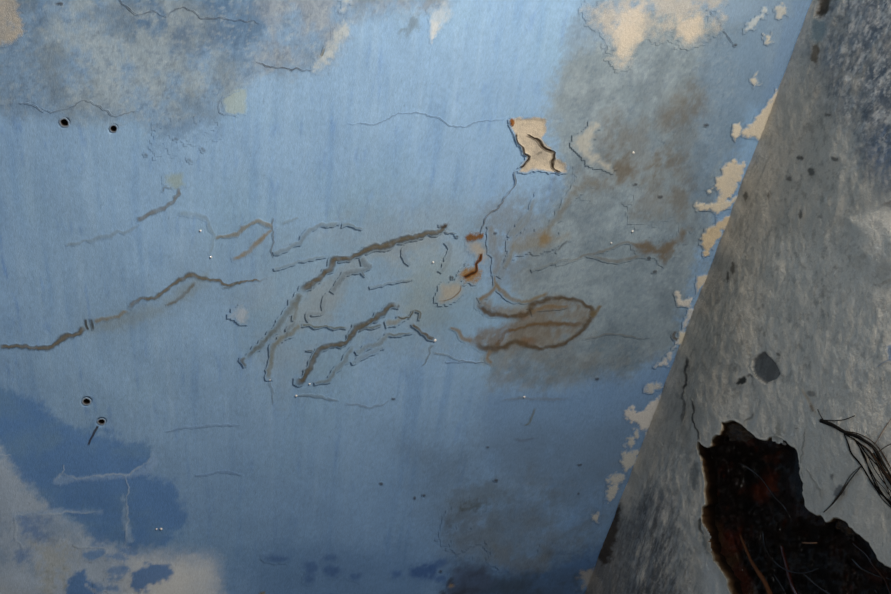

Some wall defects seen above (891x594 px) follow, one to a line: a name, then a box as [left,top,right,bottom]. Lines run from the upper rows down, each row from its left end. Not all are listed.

peeling [0,0,28,47]
peeling [578,0,731,73]
spalling [508,115,568,175]
peeling [570,120,618,174]
peeling [731,87,778,143]
peeling [693,158,749,258]
rust [434,229,490,306]
water stain [0,71,722,594]
spalling [696,419,891,594]